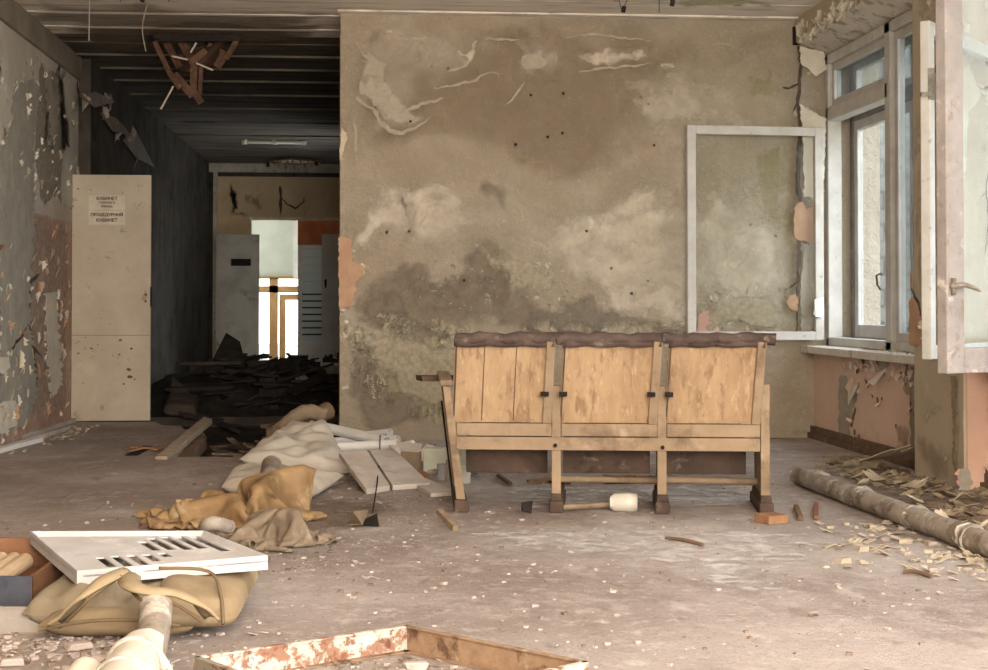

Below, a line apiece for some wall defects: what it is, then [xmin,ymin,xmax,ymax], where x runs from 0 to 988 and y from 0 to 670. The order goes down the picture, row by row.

flaking render [355,52,499,135]
flaking render [447,37,519,72]
flaking render [521,49,548,70]
flaking render [565,33,672,72]
peeling [792,0,862,76]
peeling [0,56,154,444]
peeling [324,237,366,338]
leakage [357,184,682,332]
peeling [785,103,827,331]
crack [980,175,988,252]
peeling [836,358,915,453]
peeling [934,376,980,518]